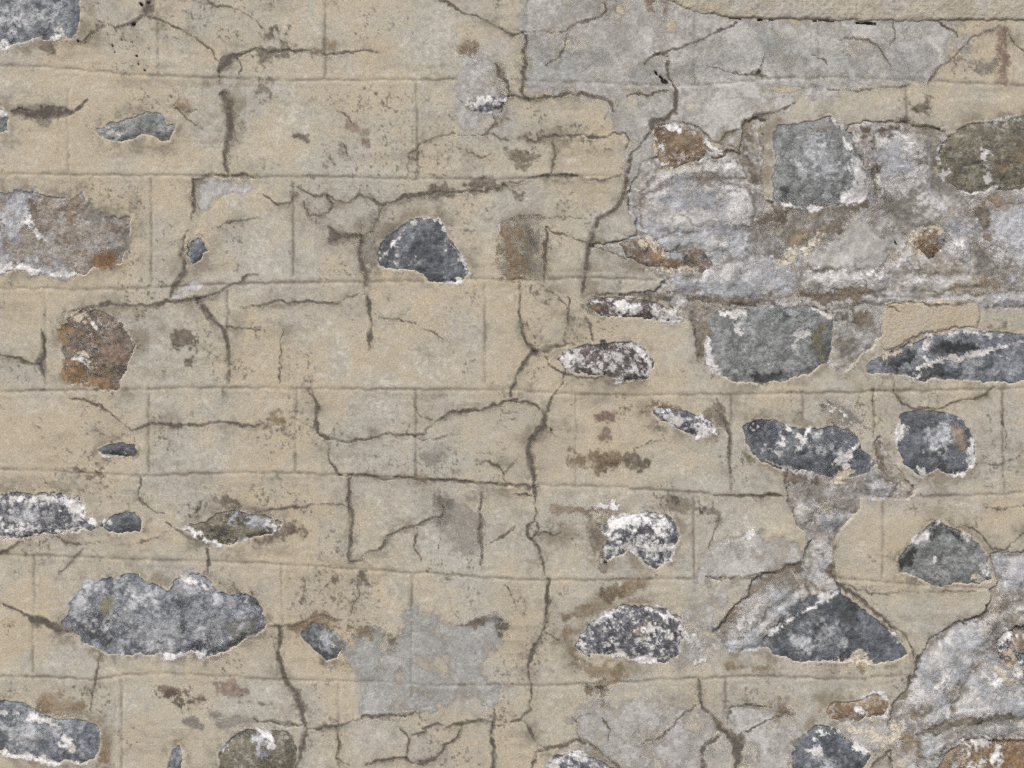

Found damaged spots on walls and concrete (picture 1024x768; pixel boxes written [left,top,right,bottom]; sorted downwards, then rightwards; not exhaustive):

crack [843,21,1024,88]
crack [10,99,88,127]
spalling [518,0,1024,385]
spalling [377,217,472,286]
crack [0,331,46,377]
spalling [57,310,135,391]
crack [69,0,799,768]
spalling [0,491,142,539]
crack [3,603,79,635]
spalling [62,568,267,661]
spalling [575,406,1024,768]
crack [835,579,915,658]